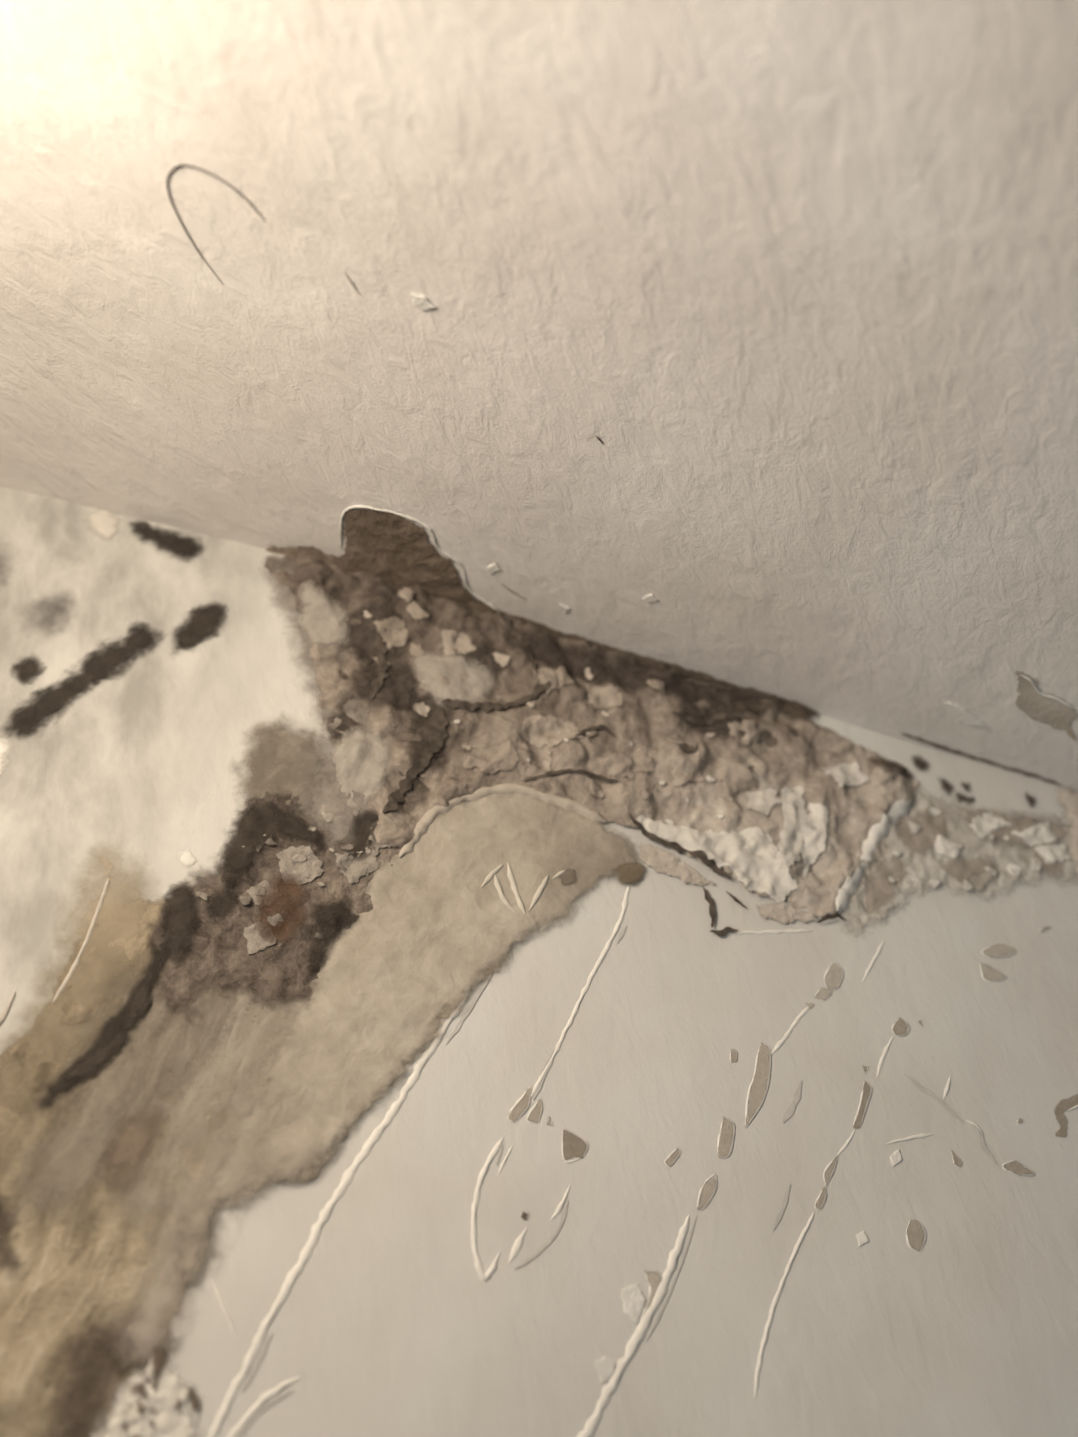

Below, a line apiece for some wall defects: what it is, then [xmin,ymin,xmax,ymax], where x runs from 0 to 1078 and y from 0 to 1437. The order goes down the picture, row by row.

water stain [132,522,201,559]
spalling [264,505,1077,936]
water stain [398,774,428,814]
water stain [0,558,401,1437]
water stain [271,943,513,1183]
peeling [508,1085,588,1164]
peeling [717,1042,771,1158]
peeling [853,1066,872,1129]
peeling [892,1018,923,1036]
peeling [697,1174,717,1210]
peeling [906,1219,926,1253]
peeling [91,1347,199,1437]